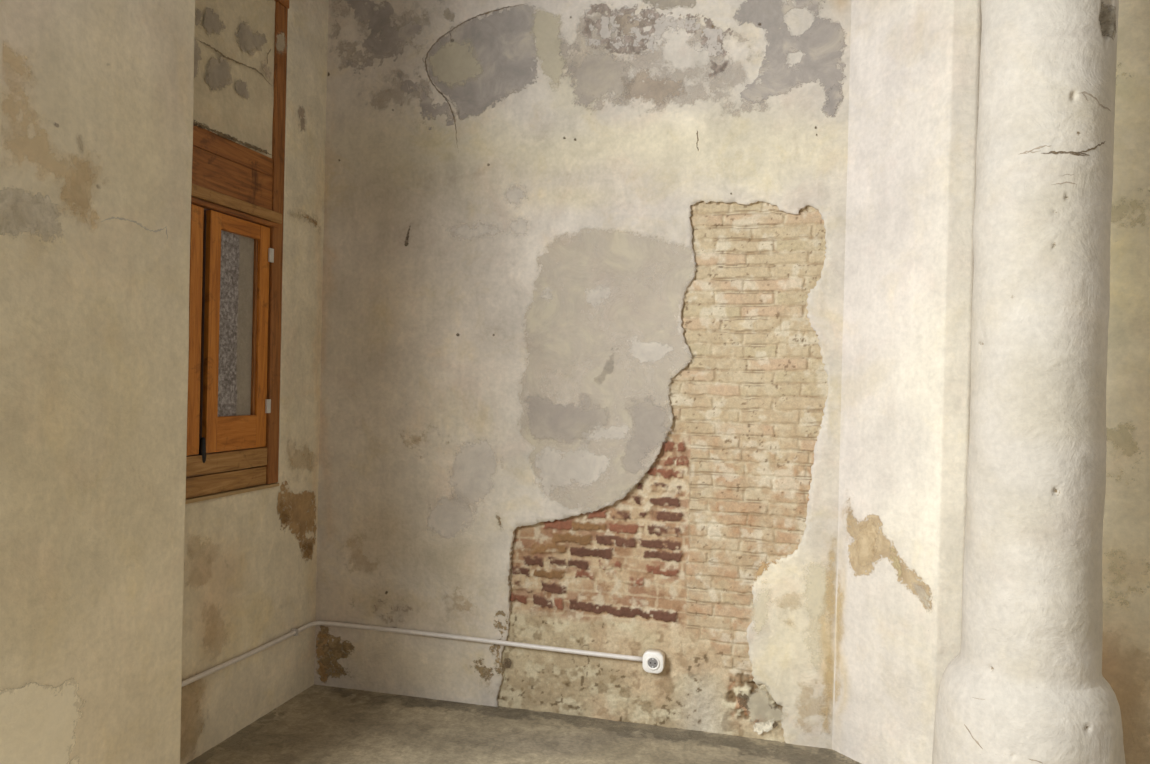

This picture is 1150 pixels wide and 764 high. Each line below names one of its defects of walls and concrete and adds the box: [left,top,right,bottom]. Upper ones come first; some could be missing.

crack [425,4,523,147]
peeling [337,0,847,130]
crack [1020,141,1105,185]
crack [1081,91,1110,110]
spalling [1099,2,1117,40]
flaking render [497,202,828,742]